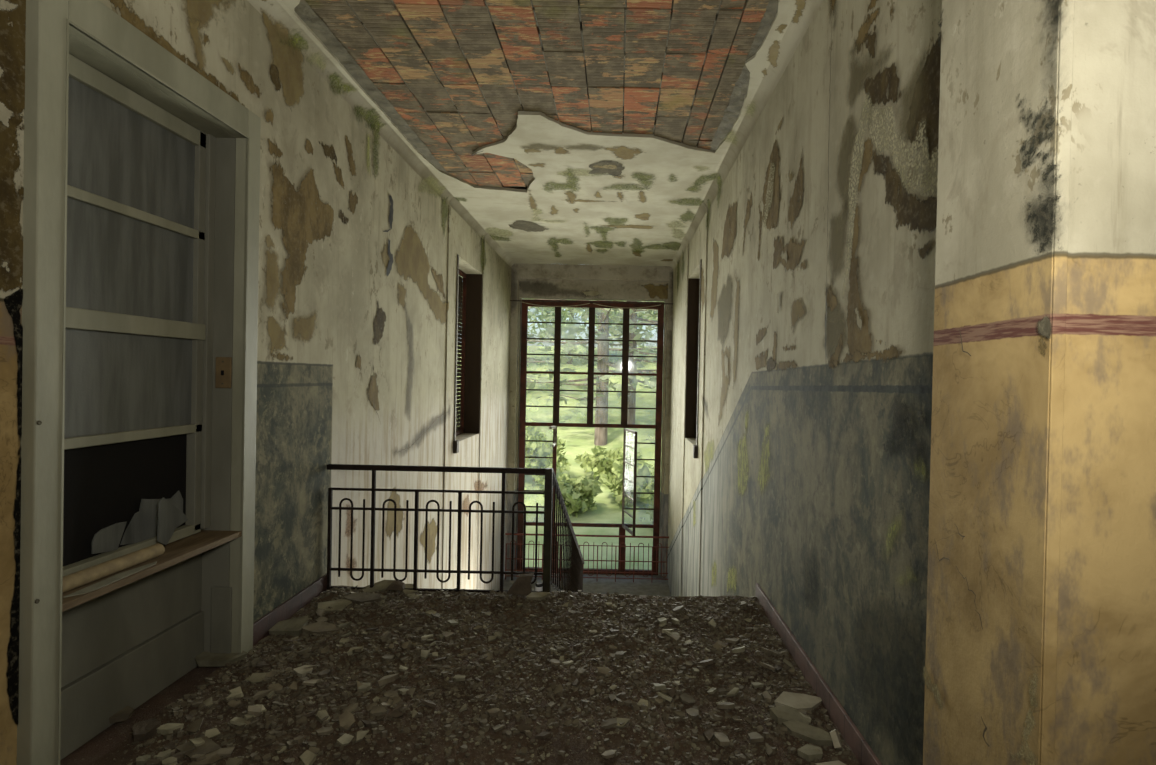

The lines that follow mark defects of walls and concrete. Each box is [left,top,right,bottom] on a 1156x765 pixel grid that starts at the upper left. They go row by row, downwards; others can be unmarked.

peeling [0,0,26,725]
peeling [110,0,262,105]
peeling [266,136,358,361]
spalling [294,0,806,187]
peeling [701,117,806,425]
peeling [828,138,937,368]
peeling [848,0,941,160]
leakage [1016,94,1061,252]
leakage [1048,0,1062,52]